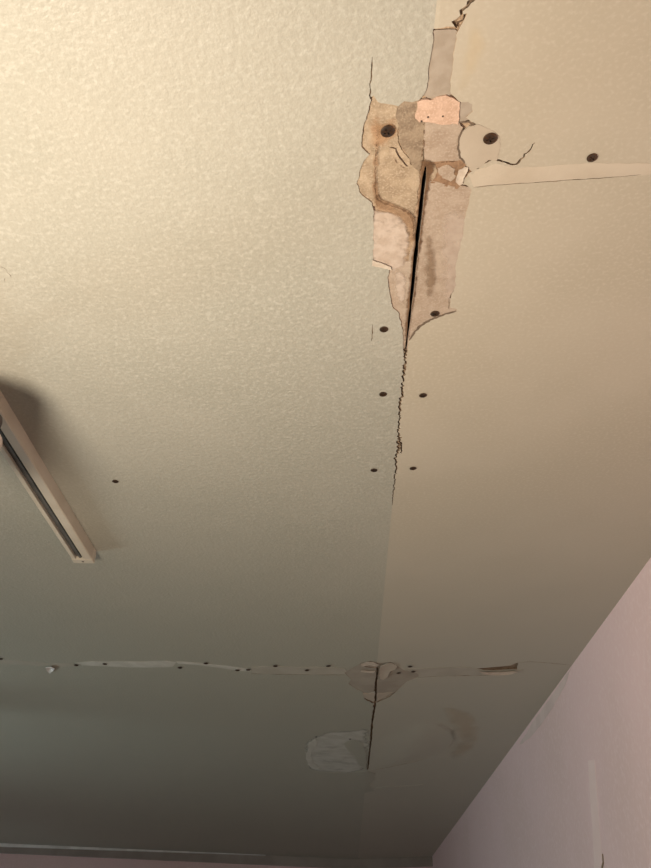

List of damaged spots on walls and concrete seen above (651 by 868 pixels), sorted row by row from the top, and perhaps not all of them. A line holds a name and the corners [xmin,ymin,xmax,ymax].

crack [452,0,474,28]
crack [392,167,426,504]
leakage [374,124,453,344]
spalling [357,13,501,352]
crack [364,666,395,770]
spalling [345,661,419,702]